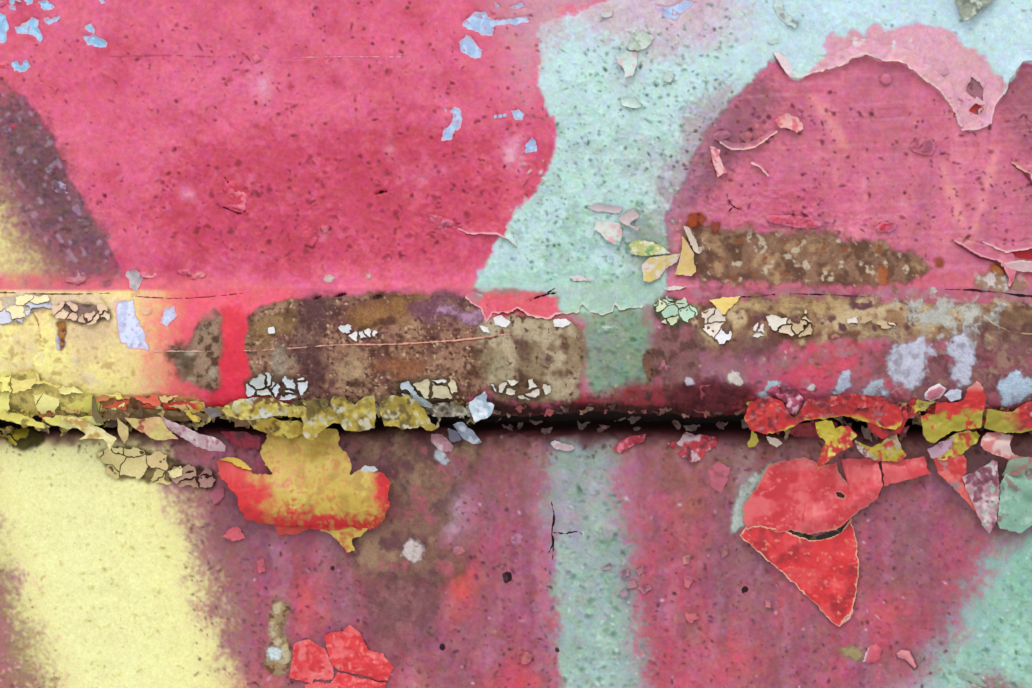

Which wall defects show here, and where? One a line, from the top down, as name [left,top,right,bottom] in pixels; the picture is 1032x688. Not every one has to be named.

peeling [0,0,60,43]
peeling [459,2,530,59]
peeling [441,107,463,141]
peeling [710,113,803,177]
peeling [767,38,1032,131]
rust [168,310,222,413]
rust [245,292,587,405]
peeling [458,204,741,344]
rust [643,213,1032,416]
peeling [954,237,1032,287]
peeling [0,369,1032,627]
peeling [289,625,394,688]